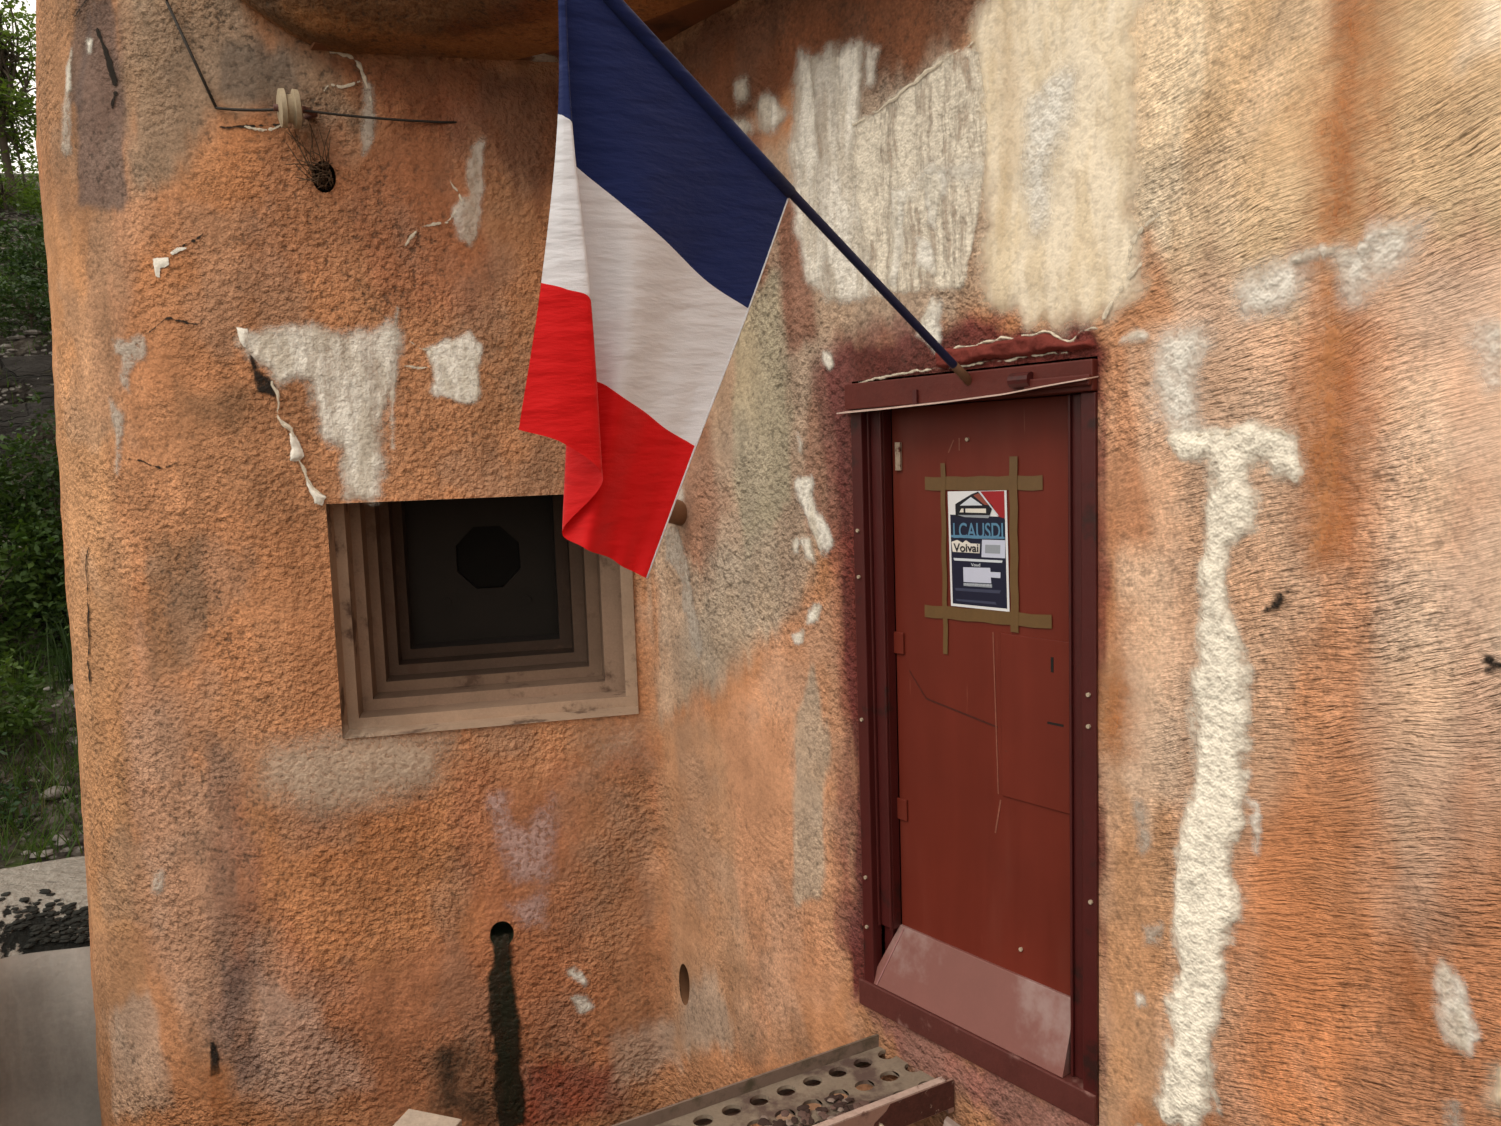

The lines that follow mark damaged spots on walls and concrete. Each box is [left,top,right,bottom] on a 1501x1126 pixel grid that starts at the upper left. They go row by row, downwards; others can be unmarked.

flaking render [237,317,482,505]
damp [1145,330,1304,1126]
damp [488,793,554,879]
damp [488,934,525,1126]